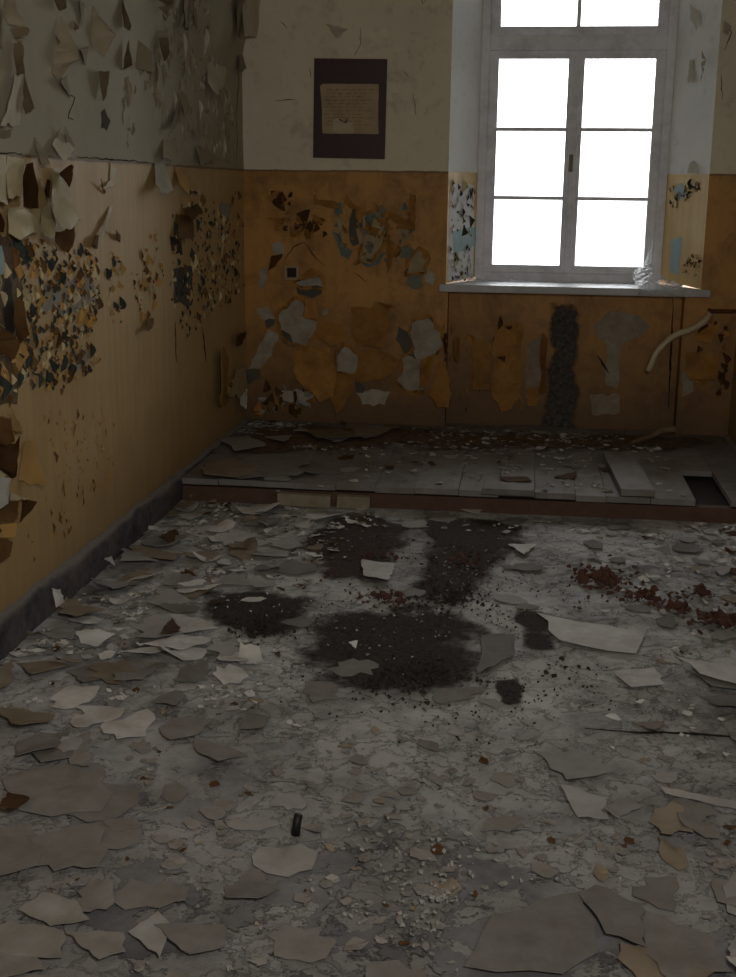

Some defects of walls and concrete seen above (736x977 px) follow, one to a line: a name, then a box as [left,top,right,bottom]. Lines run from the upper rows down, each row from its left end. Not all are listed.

peeling [237,0,260,38]
peeling [668,160,701,208]
peeling [0,0,246,563]
peeling [447,180,476,282]
peeling [670,237,702,277]
peeling [219,268,328,435]
peeling [590,311,650,416]
peeling [681,317,731,397]
peeling [292,427,686,495]
peeling [52,588,65,607]